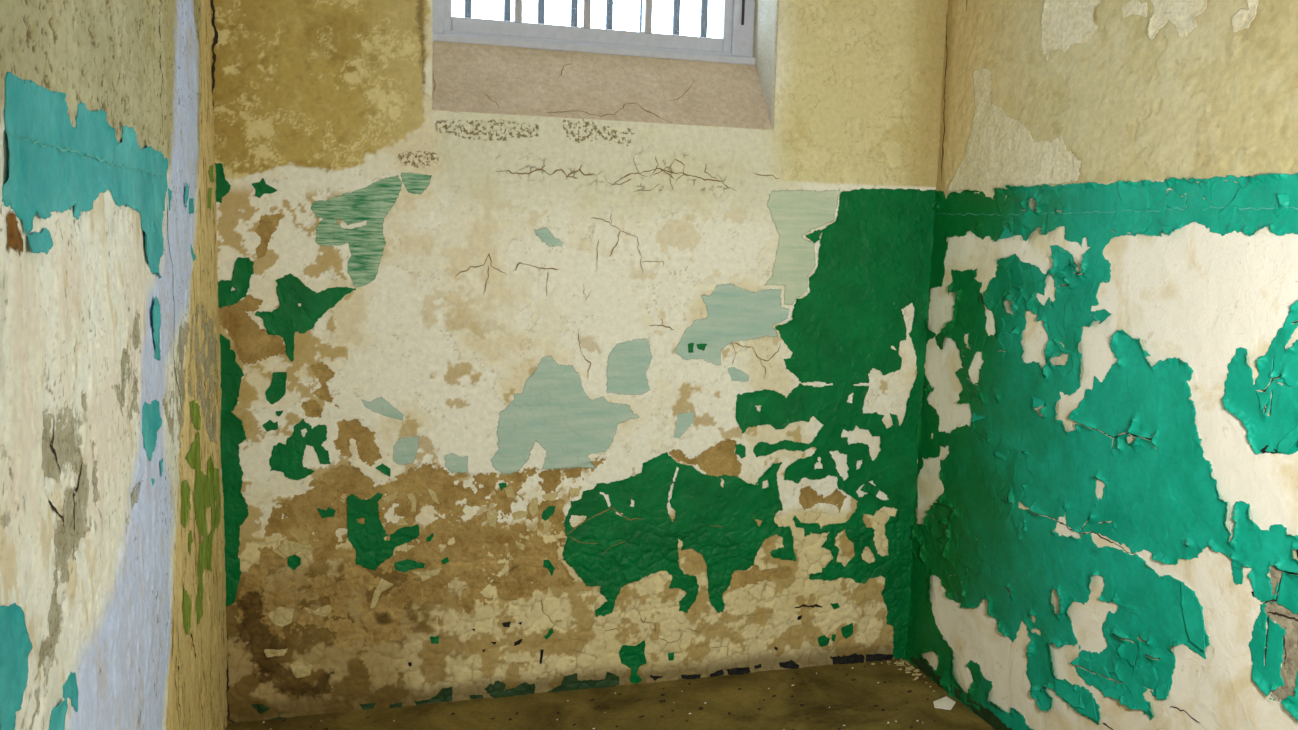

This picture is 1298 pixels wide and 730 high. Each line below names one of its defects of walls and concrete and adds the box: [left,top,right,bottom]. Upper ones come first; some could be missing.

peeling [2,72,231,279]
crack [210,0,218,106]
water stain [398,151,438,167]
water stain [435,120,538,141]
water stain [563,119,634,146]
crack [455,158,780,298]
crack [547,82,694,122]
crack [48,425,83,560]
flaking render [115,213,797,651]
peeling [736,67,1298,730]
flaking render [0,394,98,730]
water stain [234,592,335,699]